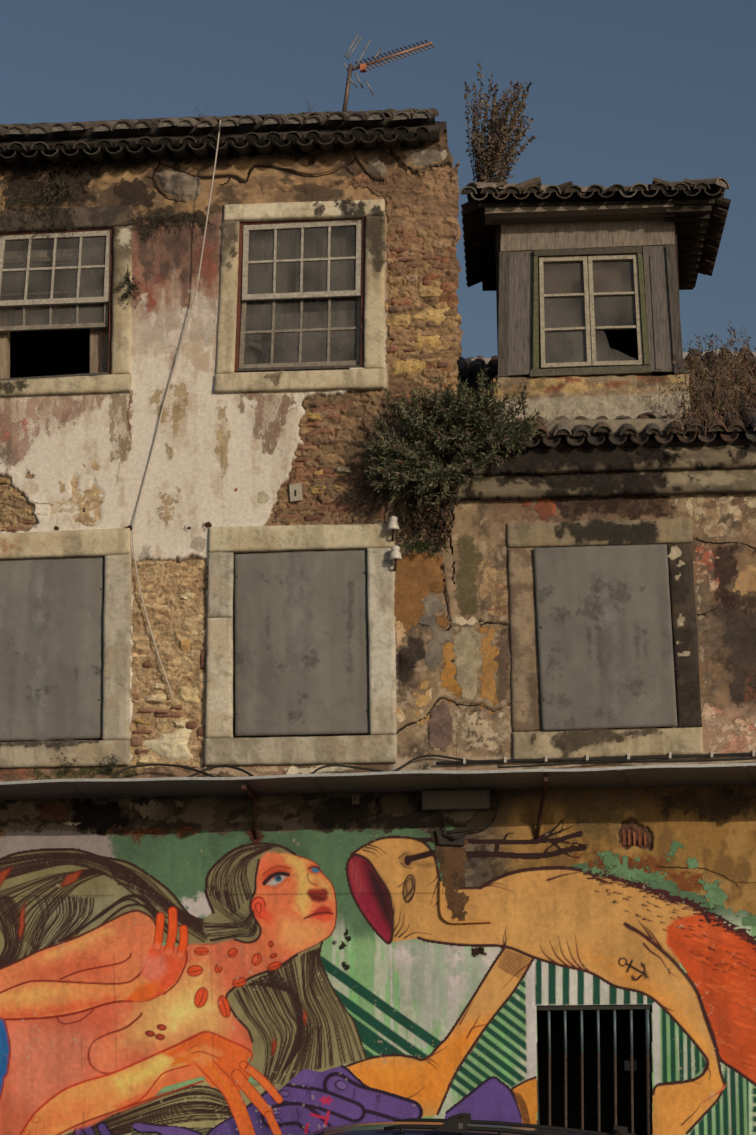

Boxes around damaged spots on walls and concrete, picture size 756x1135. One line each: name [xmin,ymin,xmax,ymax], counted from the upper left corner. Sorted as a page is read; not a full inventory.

crack [140,143,449,203]
flaking render [265,161,464,526]
flaking render [0,470,37,533]
peeling [50,461,104,527]
peeling [665,493,756,662]
flaking render [130,557,353,777]
peeling [394,550,513,758]
peeling [701,703,756,758]
peeling [582,839,728,910]